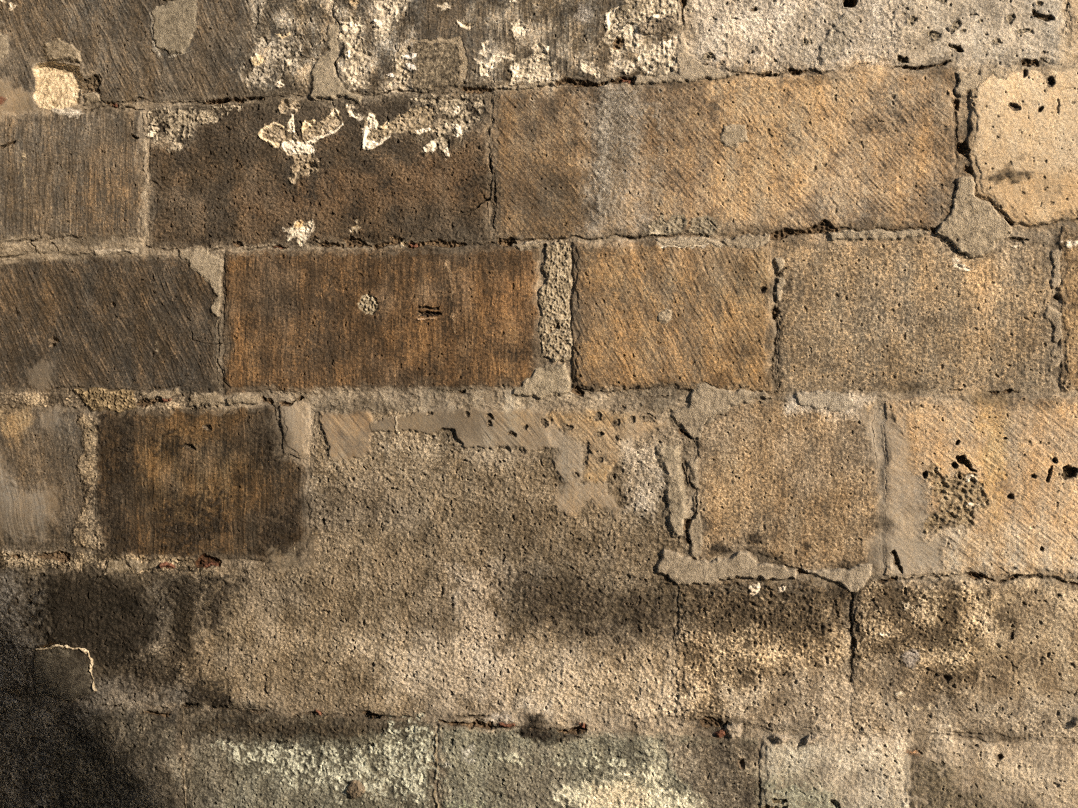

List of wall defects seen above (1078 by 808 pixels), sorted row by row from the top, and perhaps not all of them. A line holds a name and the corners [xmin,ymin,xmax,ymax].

spalling [240,0,485,184]
spalling [474,20,559,85]
spalling [575,56,601,78]
spalling [603,0,680,75]
spalling [131,104,244,152]
crack [880,572,1078,585]
water stain [174,594,204,660]
crack [848,593,856,683]
water stain [557,751,626,769]